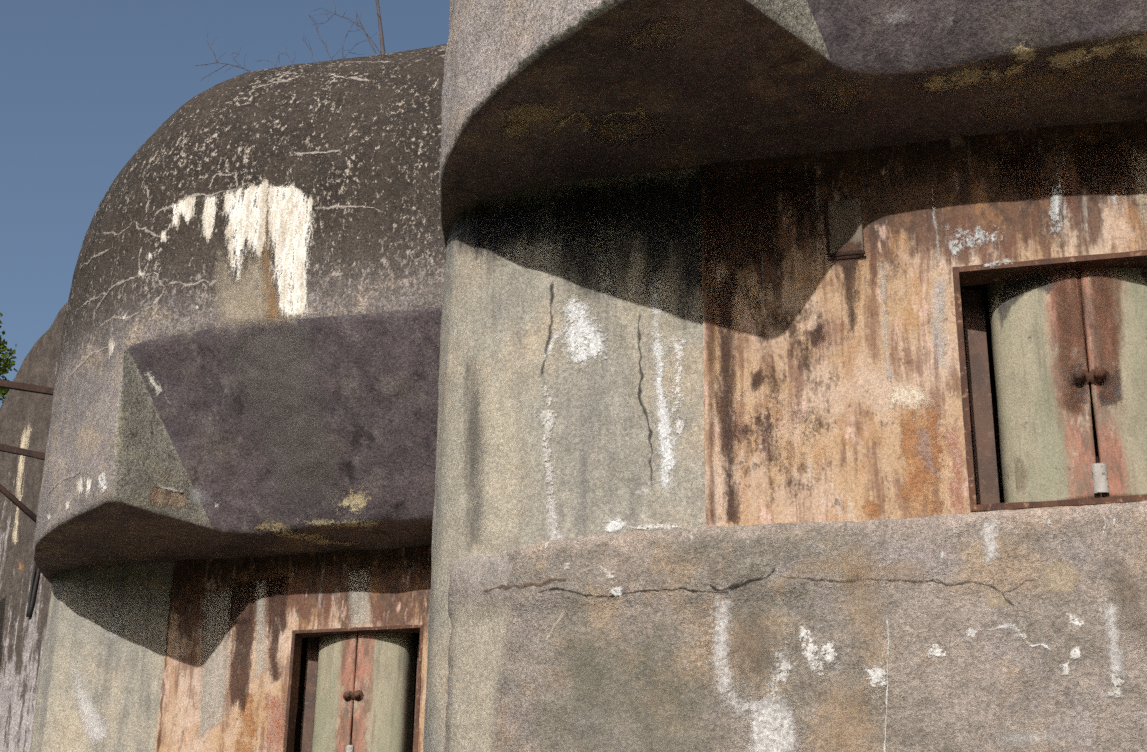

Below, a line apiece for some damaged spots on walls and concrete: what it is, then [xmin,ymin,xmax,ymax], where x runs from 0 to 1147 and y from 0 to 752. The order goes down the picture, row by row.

crack [66,170,240,379]
water stain [148,178,314,320]
crack [541,283,554,373]
water stain [454,176,702,488]
crack [638,315,652,475]
rust [900,404,964,517]
water stain [937,226,1003,256]
water stain [998,274,1055,320]
rust [1056,268,1121,410]
crack [484,569,1035,604]
rust [229,575,288,752]
water stain [713,600,837,752]